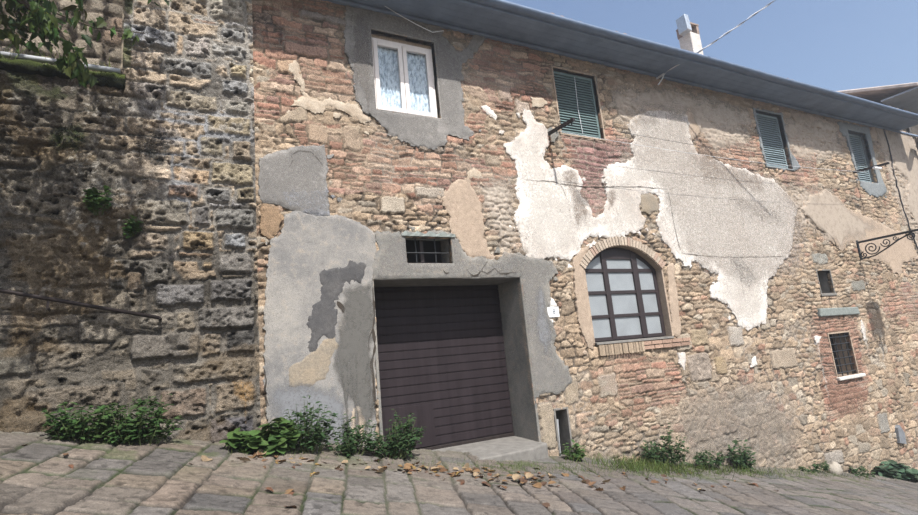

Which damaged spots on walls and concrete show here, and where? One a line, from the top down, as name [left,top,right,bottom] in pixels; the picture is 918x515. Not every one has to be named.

peeling [259,203,378,447]
peeling [286,60,372,135]
peeling [435,87,918,331]